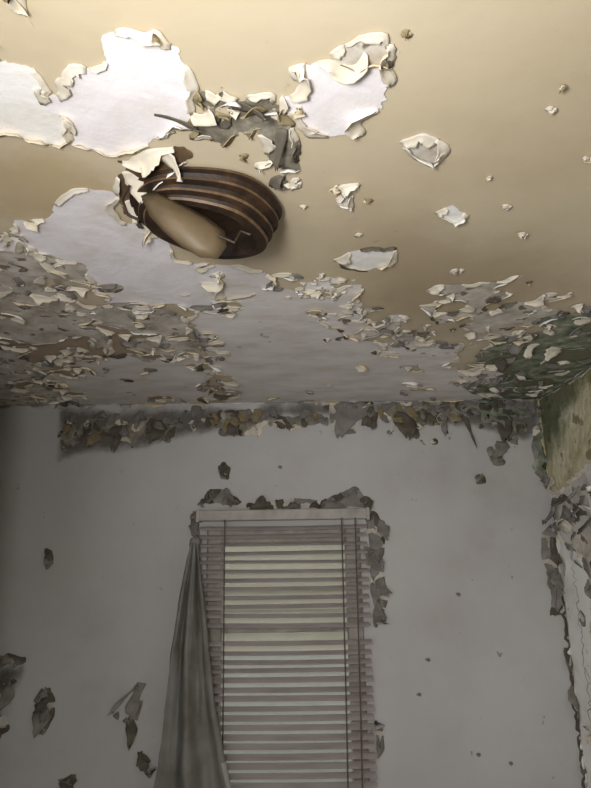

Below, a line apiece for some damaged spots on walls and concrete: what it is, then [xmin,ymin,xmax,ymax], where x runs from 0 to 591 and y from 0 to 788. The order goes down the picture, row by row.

peeling [399,133,450,170]
peeling [434,205,469,227]
damp [485,347,591,450]
damp [62,410,218,454]
peeling [0,273,591,788]